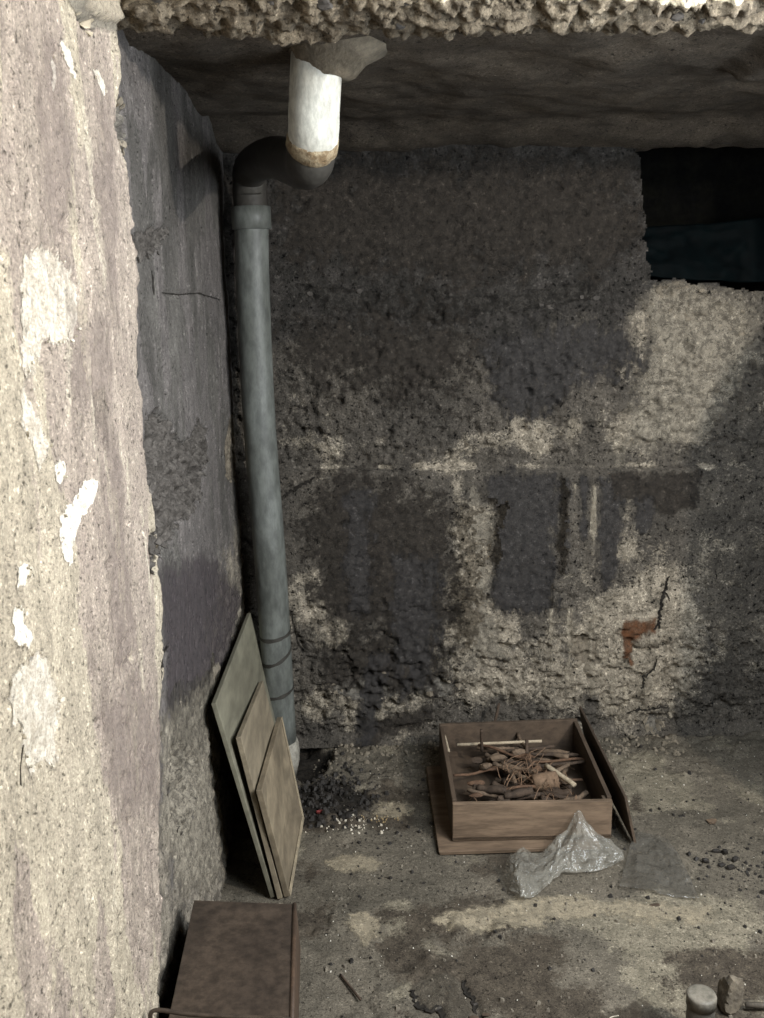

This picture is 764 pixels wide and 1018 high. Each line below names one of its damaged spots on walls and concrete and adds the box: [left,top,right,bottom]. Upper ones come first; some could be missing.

spalling [121,0,163,9]
spalling [650,0,744,22]
peeling [59,479,98,566]
leakage [295,280,764,747]
crack [654,576,670,630]
rust [622,618,656,666]
crack [627,659,669,714]